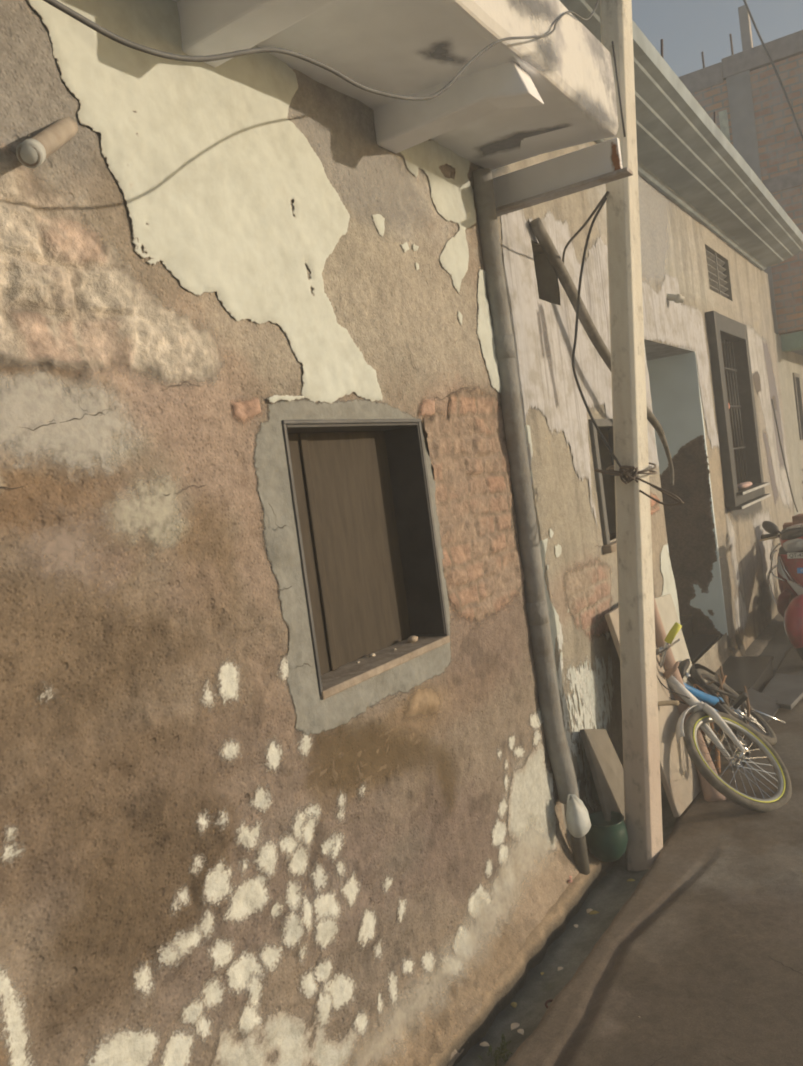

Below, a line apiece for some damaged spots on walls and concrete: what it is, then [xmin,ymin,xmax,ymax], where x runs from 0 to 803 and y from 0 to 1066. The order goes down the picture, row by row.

peeling [0,0,383,421]
peeling [372,214,385,237]
spalling [399,140,525,625]
peeling [501,209,613,526]
leakage [314,730,427,780]